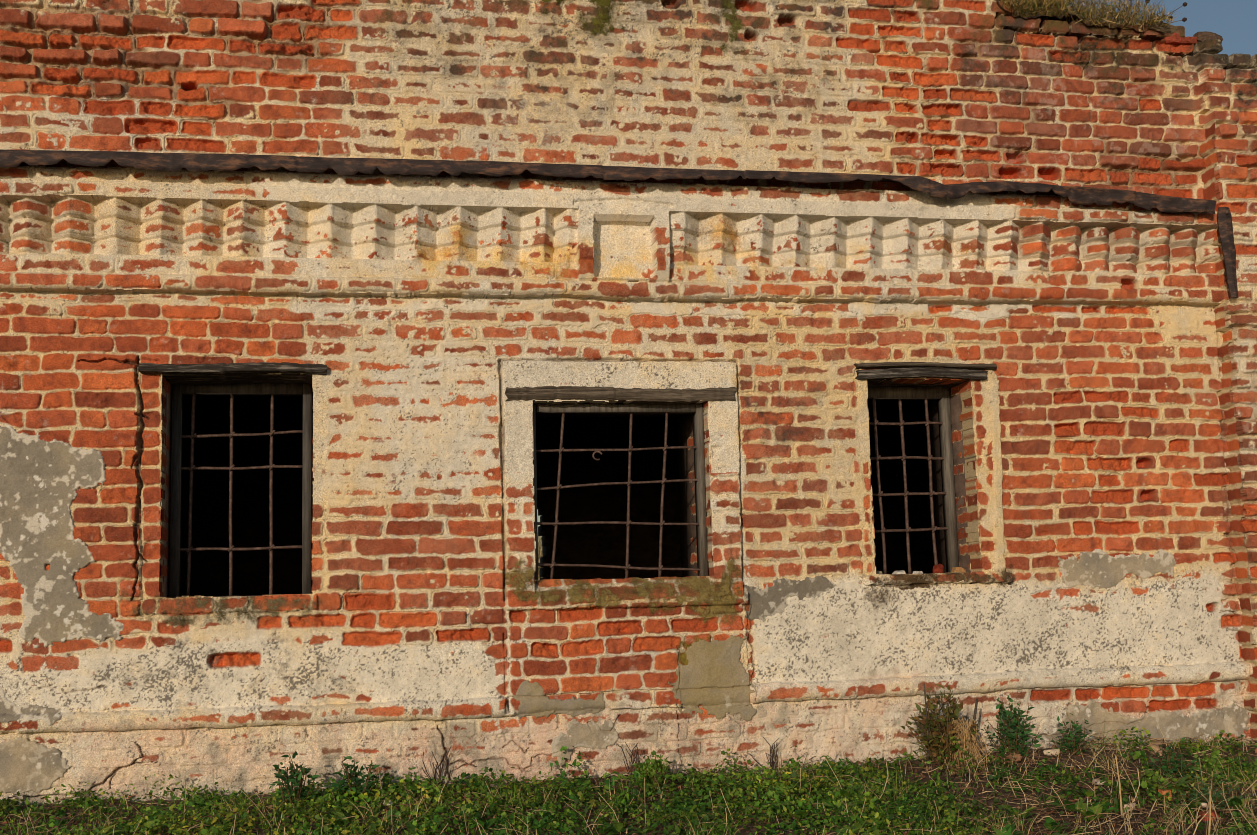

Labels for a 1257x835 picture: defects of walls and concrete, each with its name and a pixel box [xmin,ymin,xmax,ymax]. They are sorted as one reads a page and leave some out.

leakage [579,0,625,36]
spalling [0,0,363,154]
peeling [346,288,813,330]
peeling [845,277,1217,347]
spalling [159,375,171,598]
leakage [504,560,535,595]
leakage [688,557,740,624]
peeling [749,379,1257,762]
peeling [0,591,511,718]
spalling [530,604,720,659]
crack [436,724,552,780]
peeling [455,719,571,751]